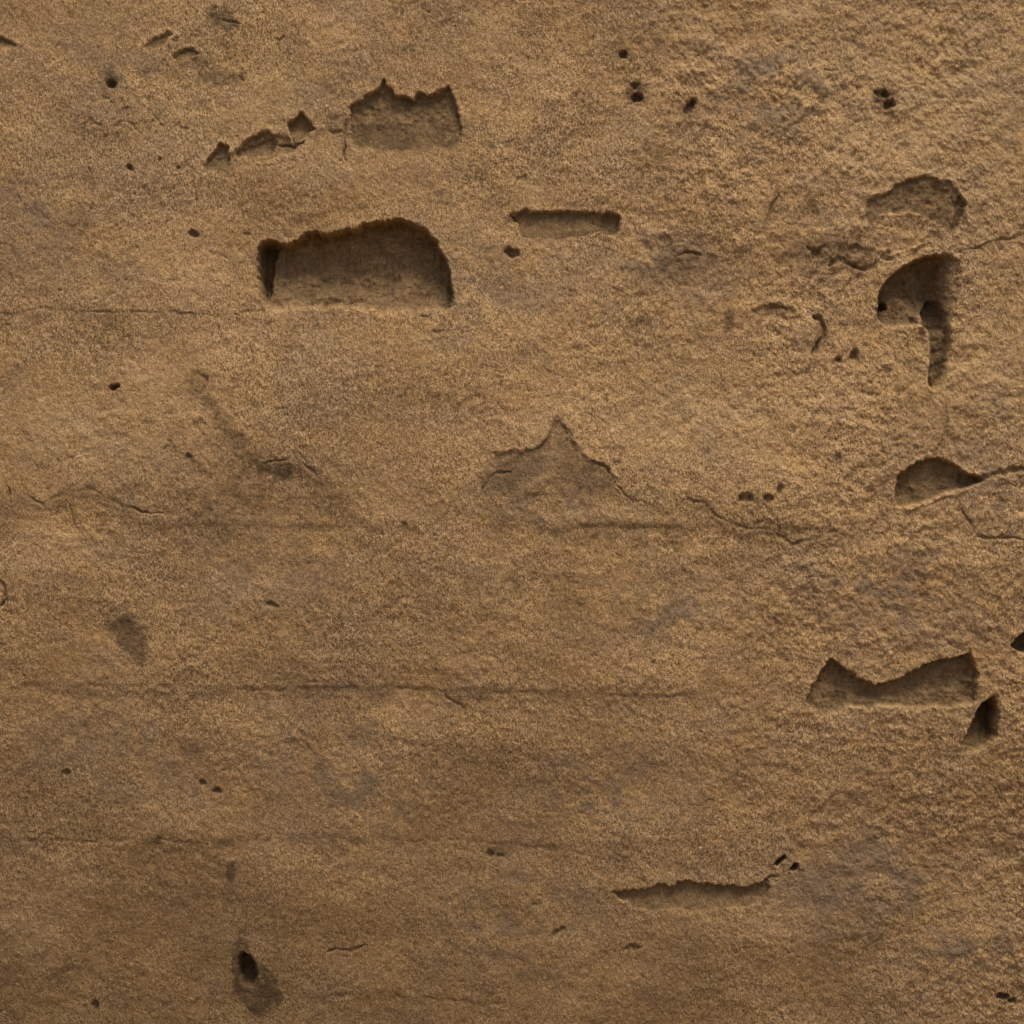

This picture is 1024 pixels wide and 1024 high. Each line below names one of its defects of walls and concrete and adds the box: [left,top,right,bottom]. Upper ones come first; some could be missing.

spalling [156,78,465,179]
spalling [256,217,458,321]
spalling [503,206,625,260]
spalling [782,173,967,332]
spalling [478,414,641,508]
crack [566,494,881,550]
spalling [893,456,968,510]
spalling [802,650,1002,763]
spalling [615,879,773,920]